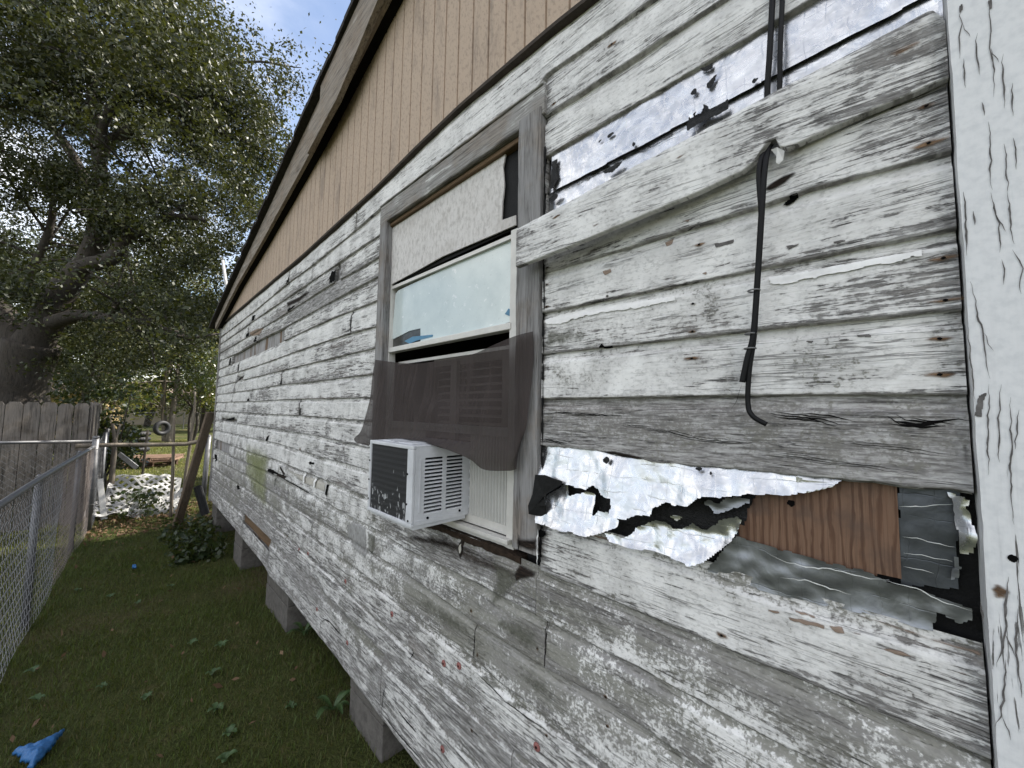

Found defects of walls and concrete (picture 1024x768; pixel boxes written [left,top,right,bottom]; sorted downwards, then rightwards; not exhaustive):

peeling [771,147,784,164]
crack [958,0,1024,292]
crack [550,282,1019,523]
peeling [704,497,750,514]
peeling [769,610,857,634]